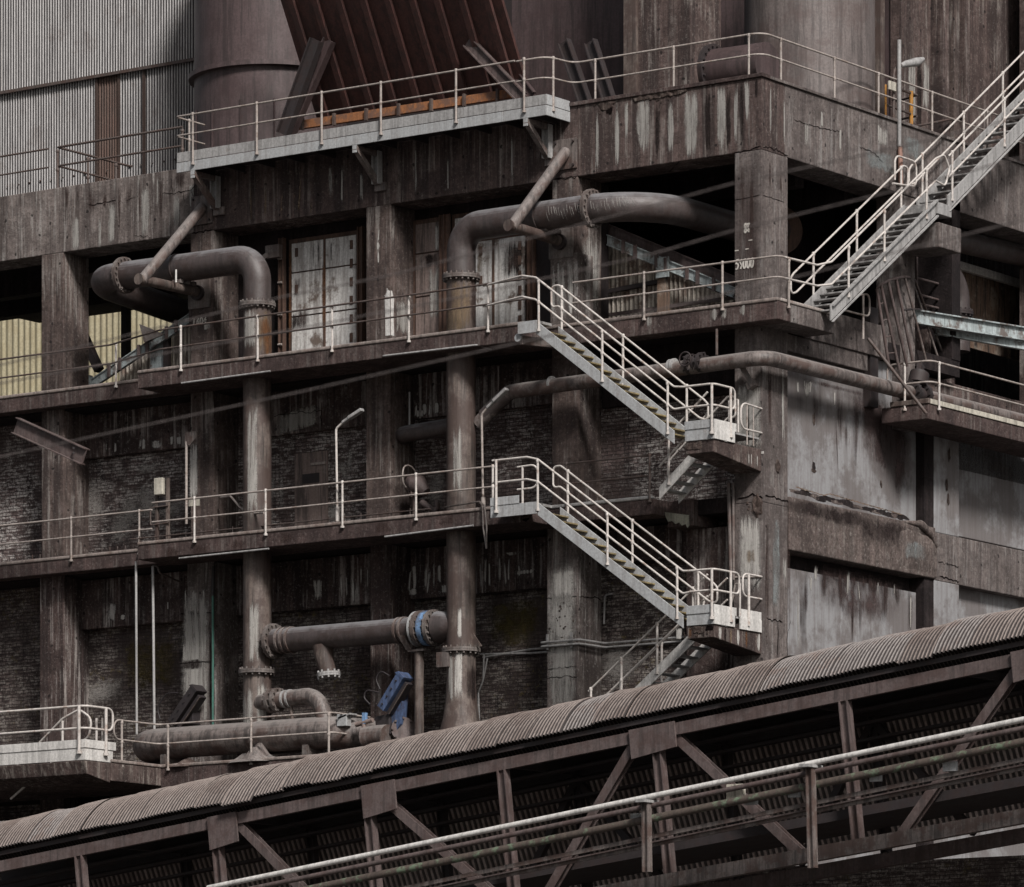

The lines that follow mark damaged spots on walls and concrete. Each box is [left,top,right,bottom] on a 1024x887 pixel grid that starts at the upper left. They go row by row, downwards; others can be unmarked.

water stain [615,80,771,164]
peeling [384,290,408,336]
water stain [768,373,784,437]
spalling [789,487,910,520]
water stain [765,522,912,632]